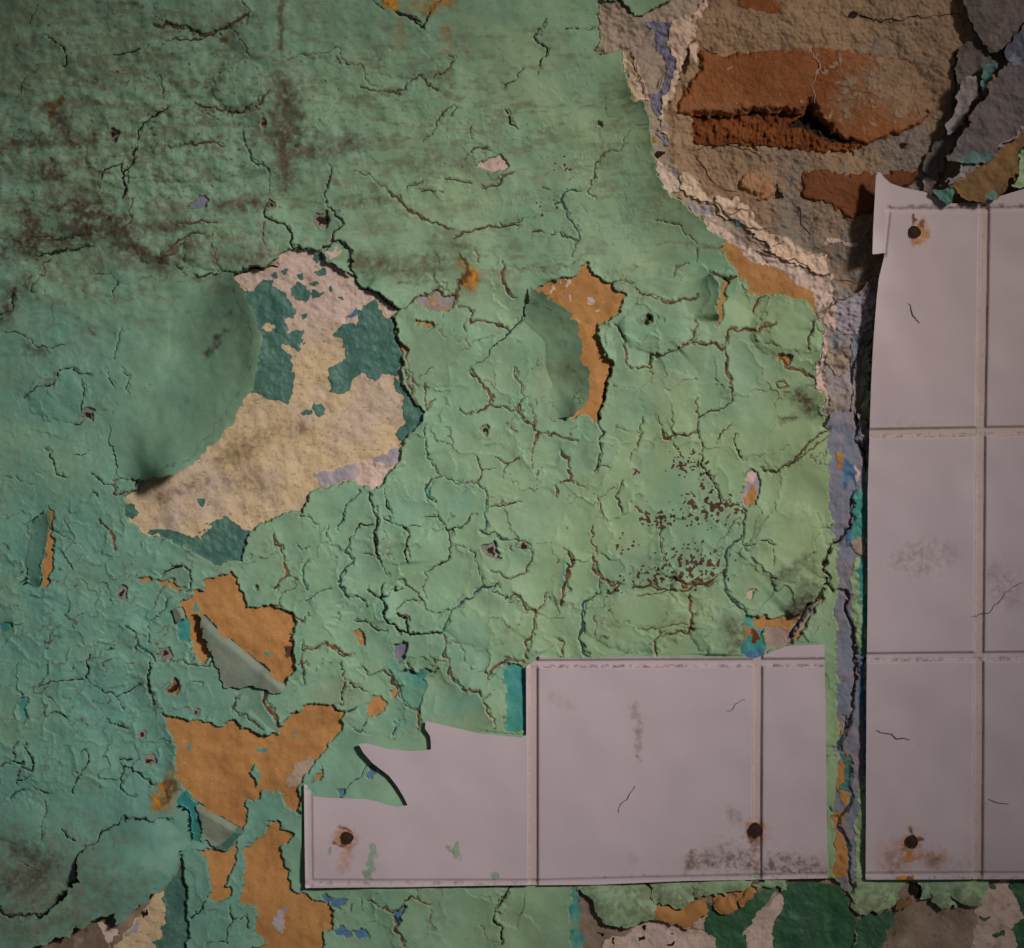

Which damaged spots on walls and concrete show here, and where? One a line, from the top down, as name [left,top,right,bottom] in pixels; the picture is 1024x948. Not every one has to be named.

crack [0,234,131,425]
peeling [125,241,424,694]
crack [160,90,830,740]
peeling [514,262,626,422]
flaking render [569,0,1024,948]
rust [908,214,929,244]
crack [0,563,213,918]
rust [151,779,177,809]
peeling [162,704,370,948]
rust [747,822,764,842]
crack [788,342,870,895]
rust [904,828,923,861]